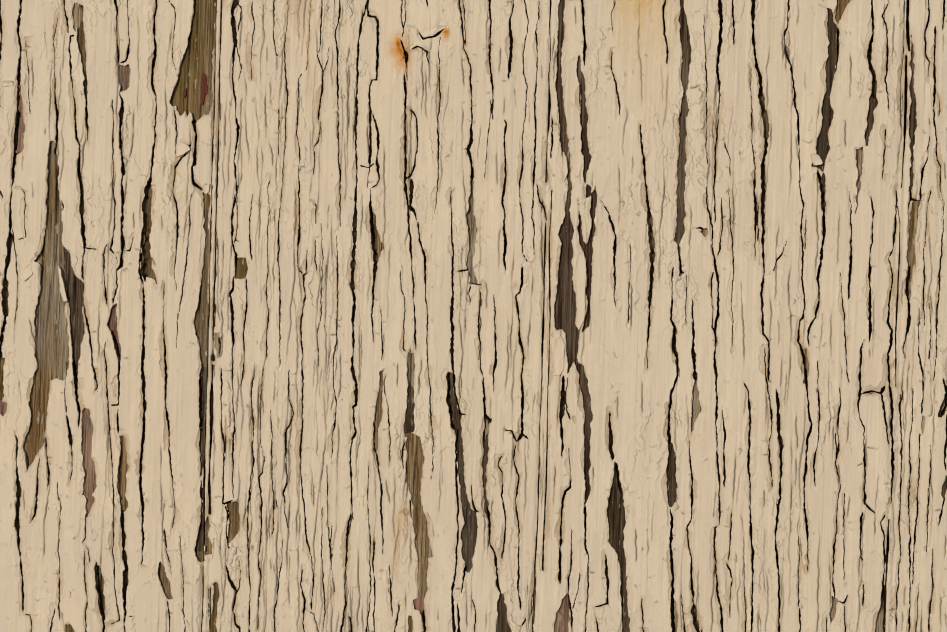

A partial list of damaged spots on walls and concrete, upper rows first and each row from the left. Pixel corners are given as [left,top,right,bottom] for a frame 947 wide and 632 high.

crack [0,0,33,357]
peeling [24,141,97,517]
crack [15,0,210,632]
peeling [170,0,217,122]
crack [199,0,553,632]
peeling [403,351,433,632]
peeling [552,0,597,507]
crack [580,0,588,66]
crack [558,376,610,632]
peeling [607,462,630,632]
peeling [668,0,692,276]
crack [604,0,947,632]